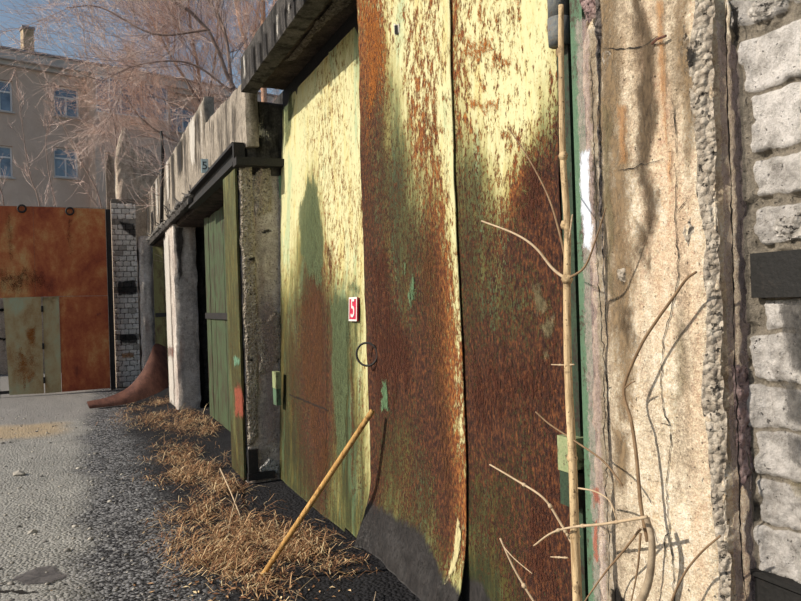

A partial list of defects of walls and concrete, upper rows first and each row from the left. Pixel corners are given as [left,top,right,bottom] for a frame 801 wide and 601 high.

leakage [146,104,234,232]
rust [468,82,501,117]
rust [462,35,511,73]
leakage [576,0,659,601]
crack [590,33,665,595]
crack [618,159,688,601]